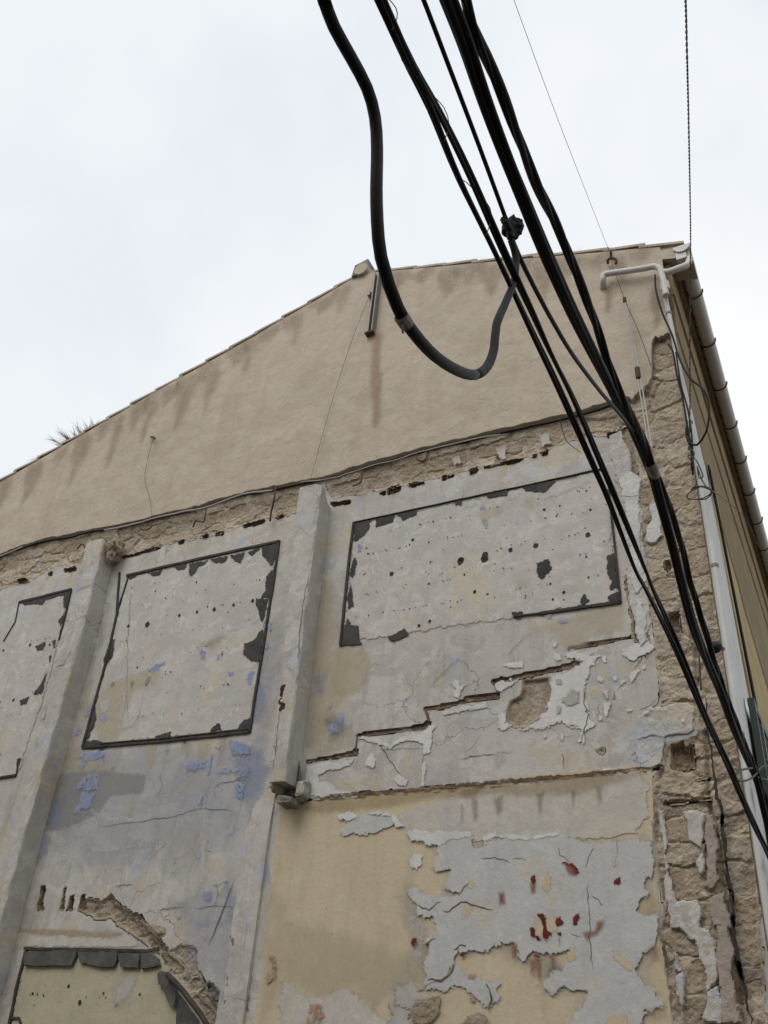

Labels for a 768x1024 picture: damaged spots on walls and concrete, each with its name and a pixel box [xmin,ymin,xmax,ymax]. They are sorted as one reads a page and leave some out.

flaking render [0,336,768,1024]
crack [161,881,234,945]
crack [559,843,618,971]